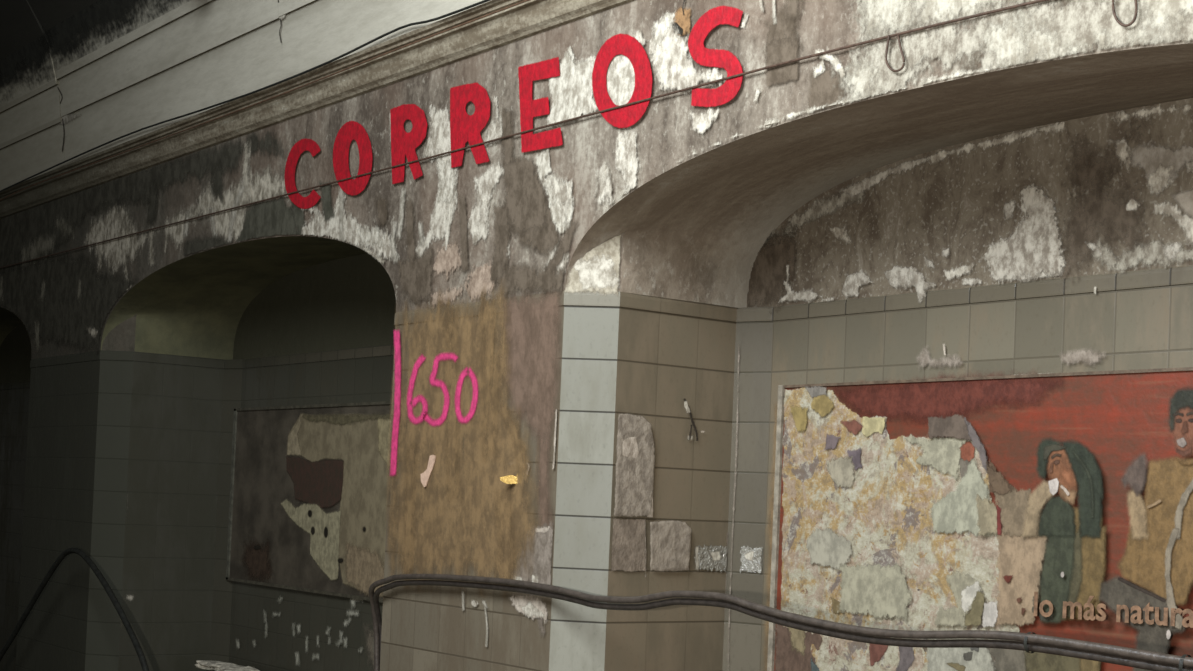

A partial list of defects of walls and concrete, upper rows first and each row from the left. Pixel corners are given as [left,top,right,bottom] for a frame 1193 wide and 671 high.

water stain [547,46,598,126]
water stain [606,54,635,106]
water stain [633,13,722,93]
water stain [688,108,719,134]
spalling [1111,105,1193,142]
water stain [593,131,638,204]
spalling [765,122,1065,243]
water stain [1071,139,1193,200]
water stain [1126,199,1140,211]
spalling [1154,190,1193,245]
water stain [1087,240,1193,273]